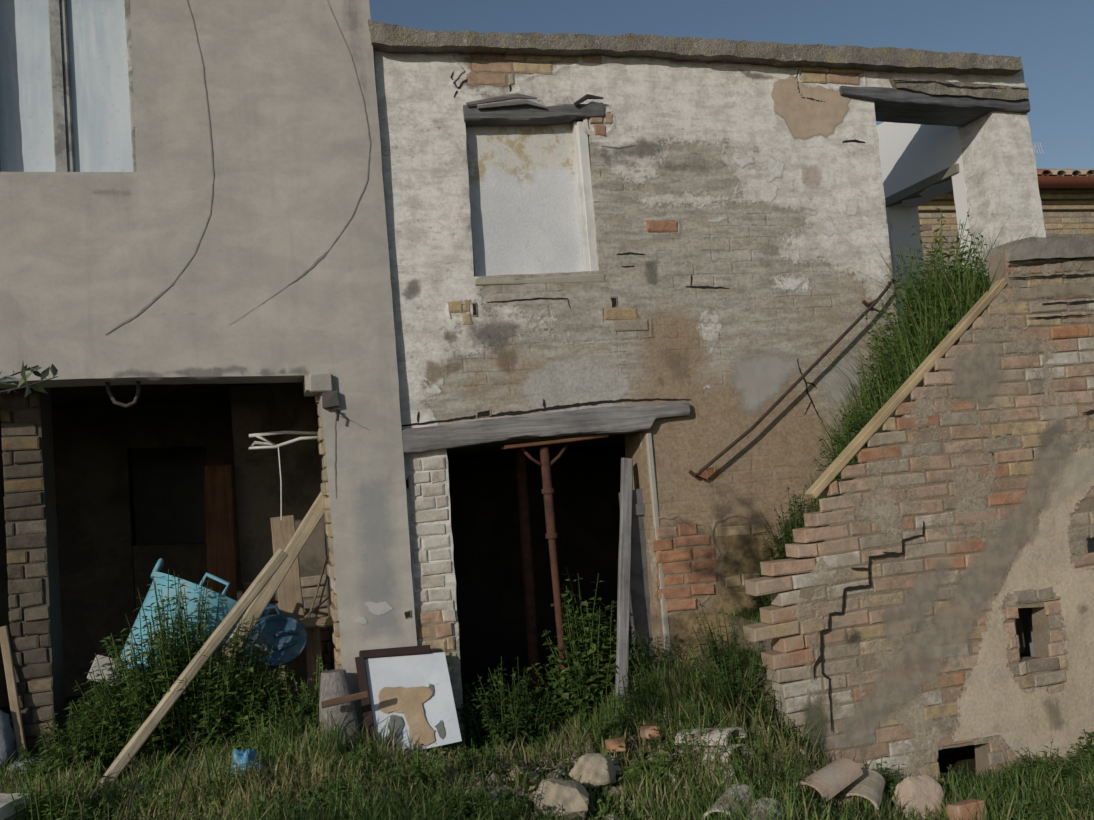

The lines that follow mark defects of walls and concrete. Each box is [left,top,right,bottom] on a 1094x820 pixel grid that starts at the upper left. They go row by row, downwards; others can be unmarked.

crack [105,0,214,335]
crack [231,0,371,324]
spalling [449,53,604,96]
spalling [772,66,868,139]
spalling [647,511,778,618]
crack [813,521,924,731]